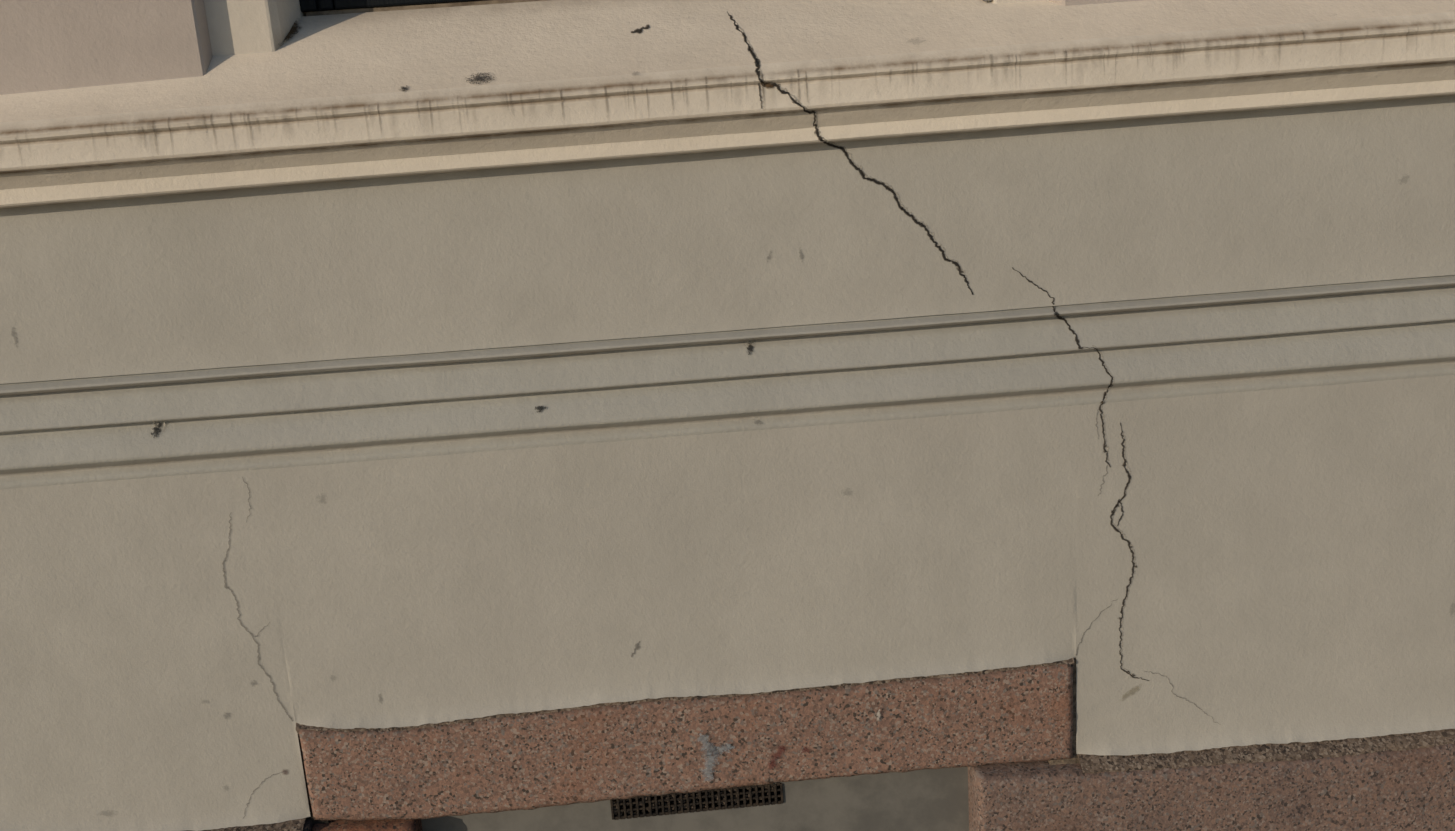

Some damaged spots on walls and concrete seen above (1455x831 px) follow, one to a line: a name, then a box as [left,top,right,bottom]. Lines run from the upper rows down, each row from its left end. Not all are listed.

crack [727,12,974,295]
crack [1012,267,1149,681]